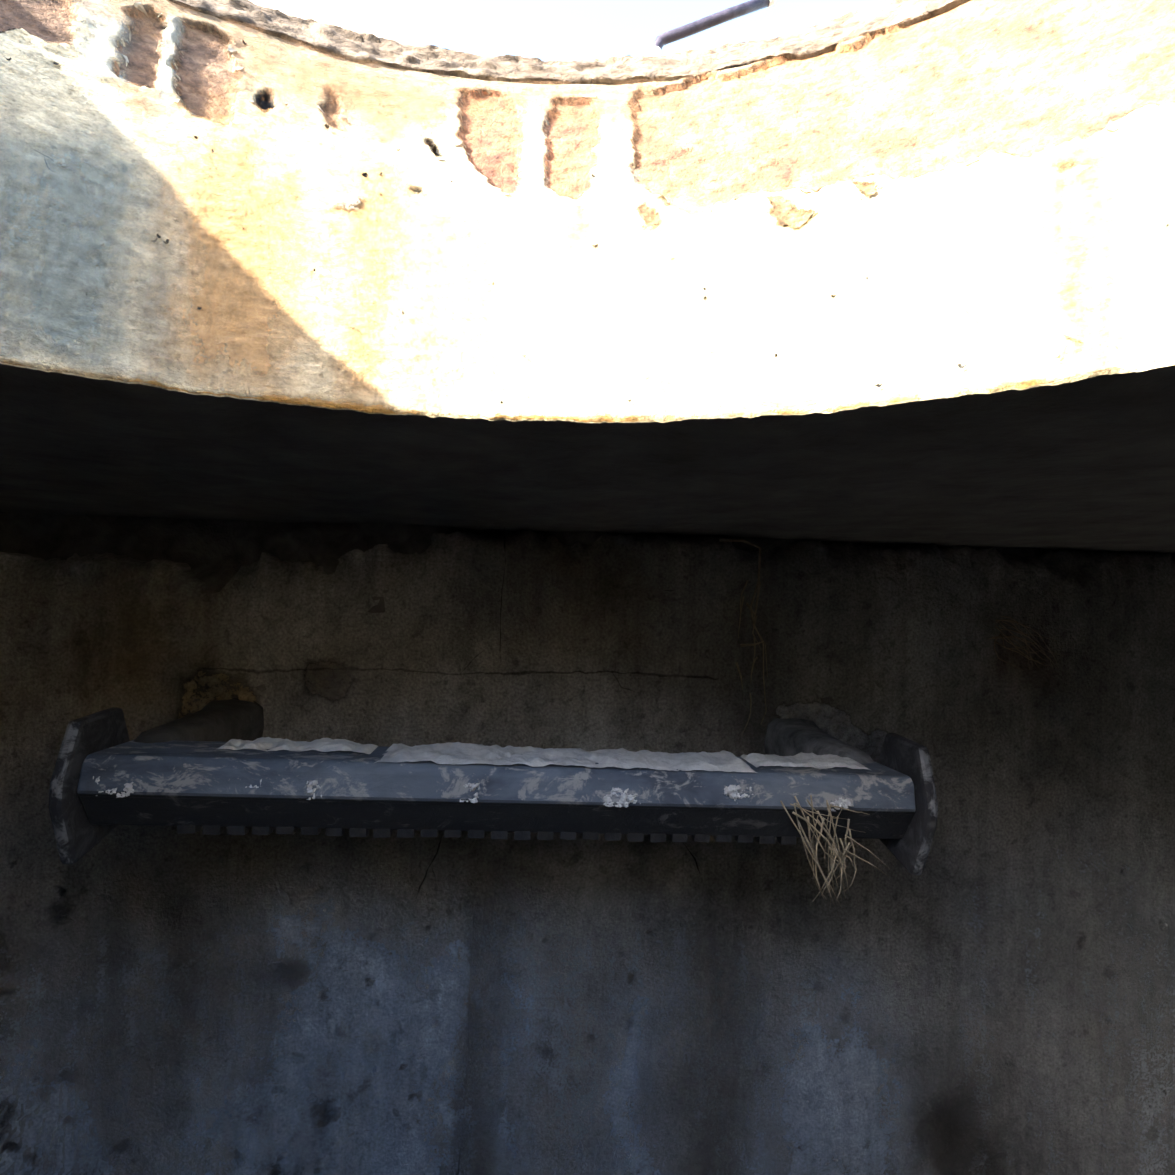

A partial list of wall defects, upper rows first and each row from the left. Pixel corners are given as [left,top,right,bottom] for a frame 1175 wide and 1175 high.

peeling [0,0,83,45]
peeling [112,2,288,125]
spalling [425,138,445,161]
peeling [455,88,602,199]
peeling [628,0,1175,232]